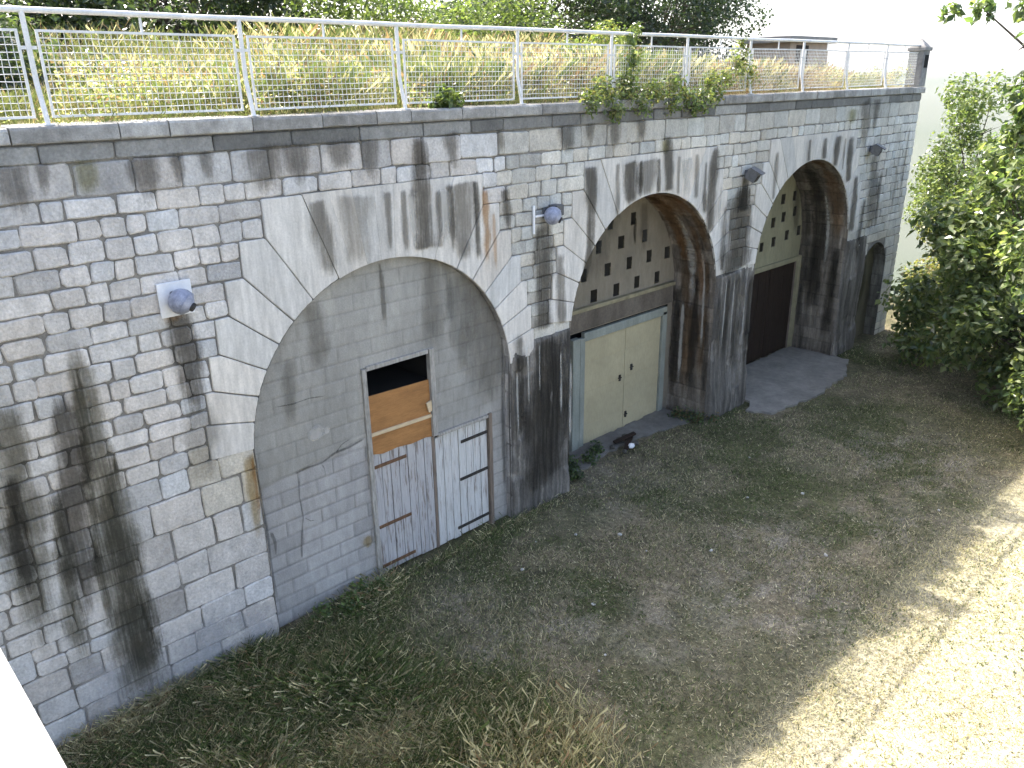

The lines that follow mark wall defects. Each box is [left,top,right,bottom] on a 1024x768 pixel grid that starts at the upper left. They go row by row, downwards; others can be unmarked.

water stain [415,142,431,248]
water stain [585,168,597,274]
water stain [627,162,642,199]
water stain [658,141,673,191]
water stain [704,151,717,227]
water stain [804,141,838,320]
water stain [823,137,865,241]
water stain [519,340,569,478]
water stain [8,482,30,579]
water stain [56,406,94,583]